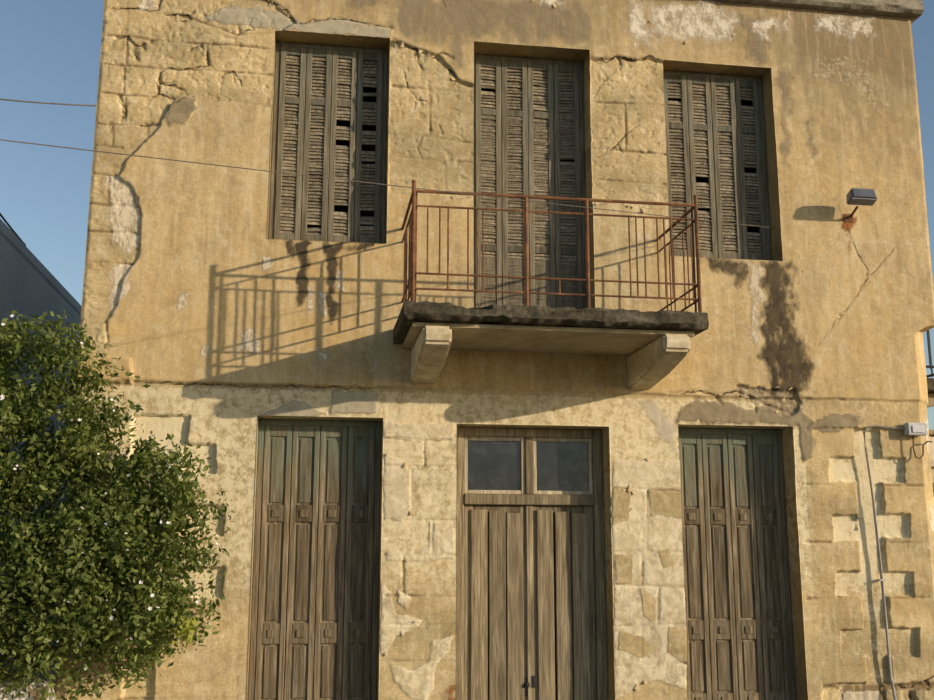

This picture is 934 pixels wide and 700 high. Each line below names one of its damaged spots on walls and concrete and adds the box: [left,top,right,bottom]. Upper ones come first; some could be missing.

crack [115,0,193,22]
crack [153,45,242,99]
crack [267,0,471,105]
crack [592,55,660,93]
peeling [629,0,740,46]
peeling [817,15,872,38]
flaking render [77,0,294,357]
leakage [286,240,311,305]
leakage [323,241,375,320]
leakage [708,257,749,286]
leakage [759,260,814,396]
peeling [380,581,422,656]